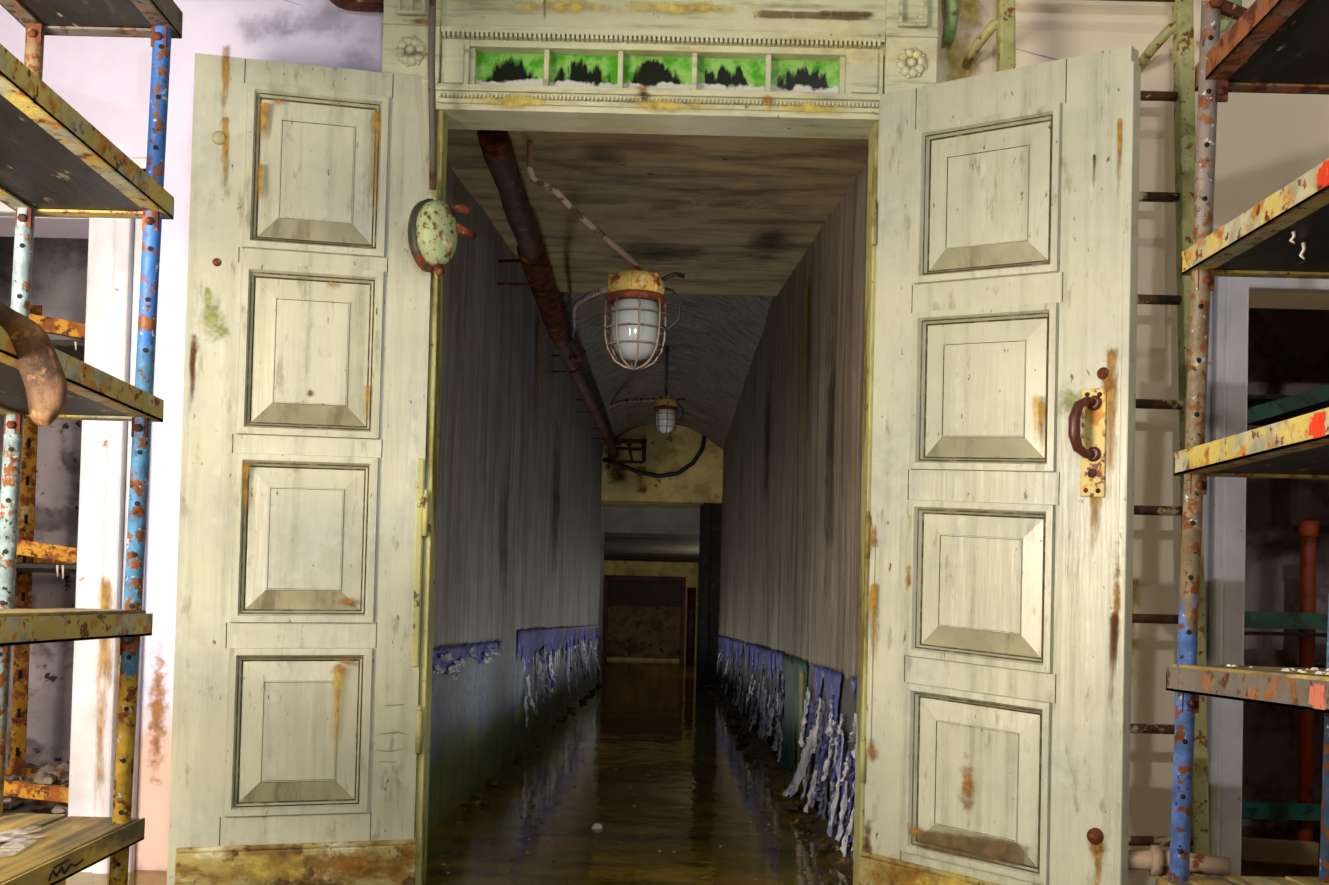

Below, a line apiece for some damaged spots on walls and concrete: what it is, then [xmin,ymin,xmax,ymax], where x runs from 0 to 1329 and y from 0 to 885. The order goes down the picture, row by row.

water stain [949,45,976,80]
peeling [870,584,878,640]
peeling [432,625,601,727]
peeling [715,635,876,859]